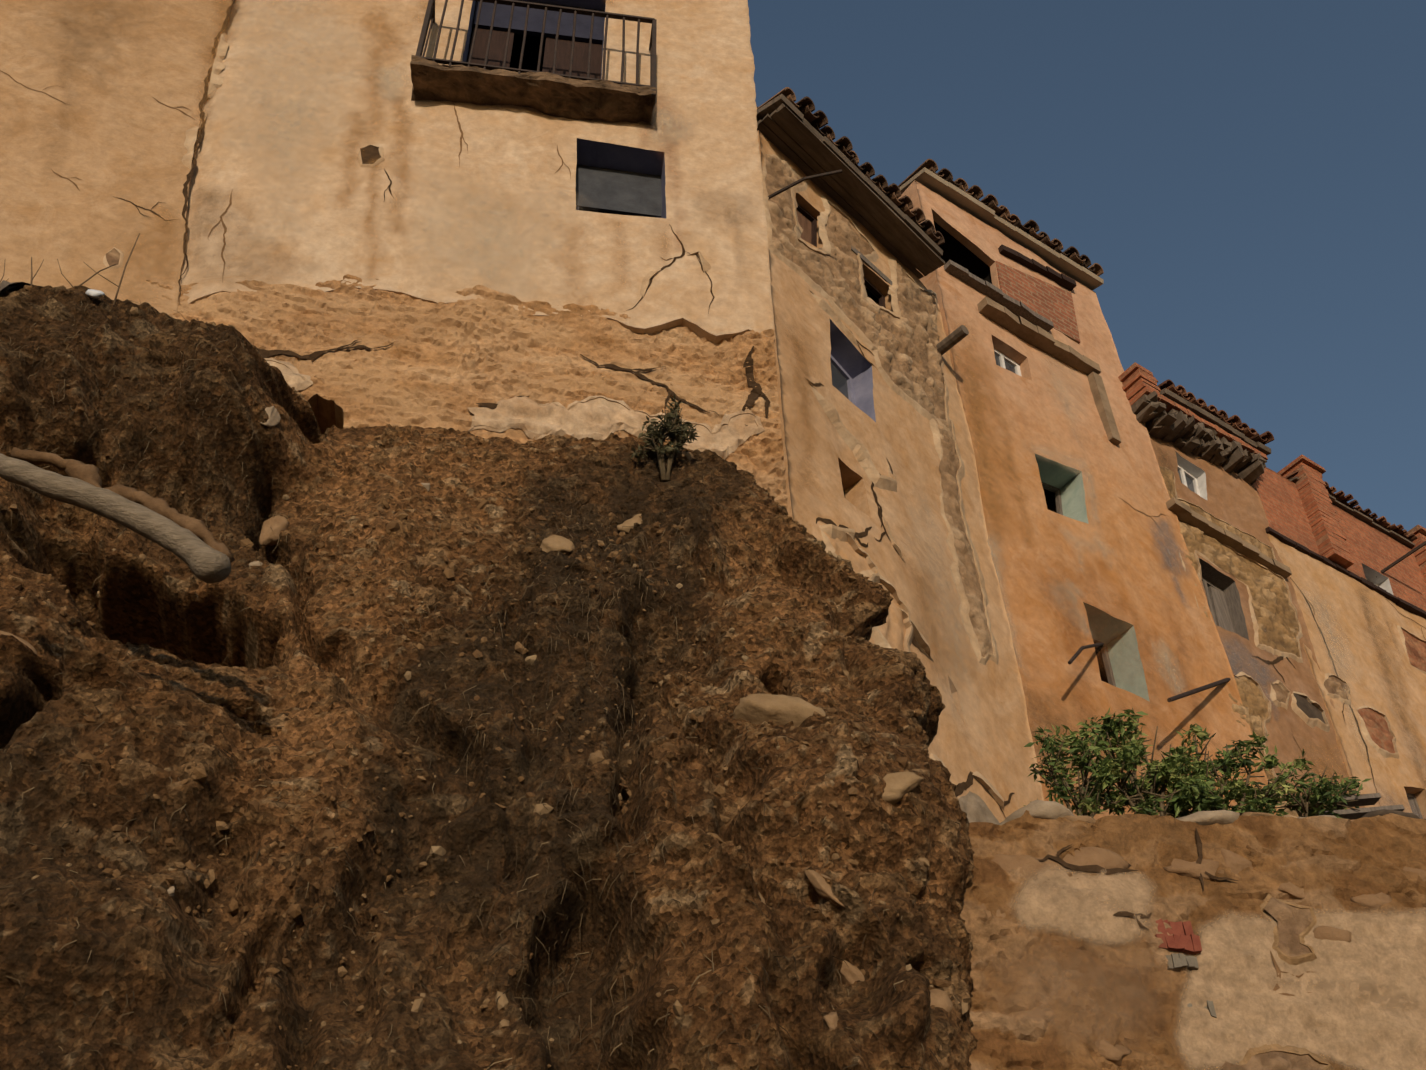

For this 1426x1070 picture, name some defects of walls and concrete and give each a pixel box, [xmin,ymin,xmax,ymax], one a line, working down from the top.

crack [116,0,236,303]
crack [626,224,715,313]
spalling [264,358,313,391]
crack [253,340,394,360]
spalling [467,396,765,460]
crack [580,346,770,426]
crack [806,378,905,562]
spalling [762,154,999,665]
spalling [1159,466,1303,663]
spalling [1228,671,1399,818]
peeling [1177,894,1426,1070]